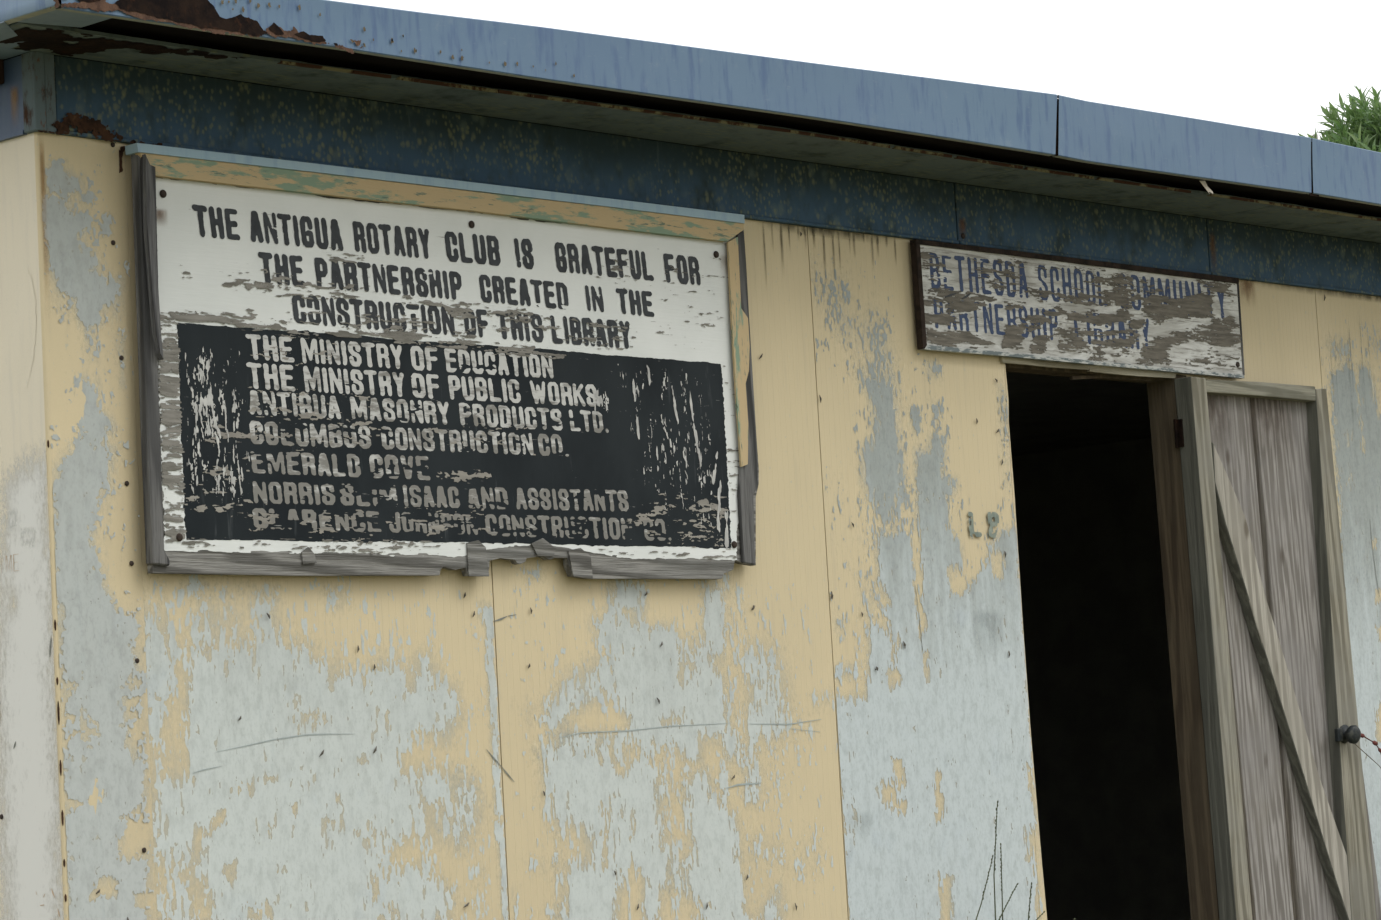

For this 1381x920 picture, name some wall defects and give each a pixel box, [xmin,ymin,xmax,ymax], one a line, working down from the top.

corrosion [0,27,244,60]
corrosion [50,0,374,54]
corrosion [38,113,163,173]
peeling [0,154,1043,920]
peeling [1320,319,1381,904]